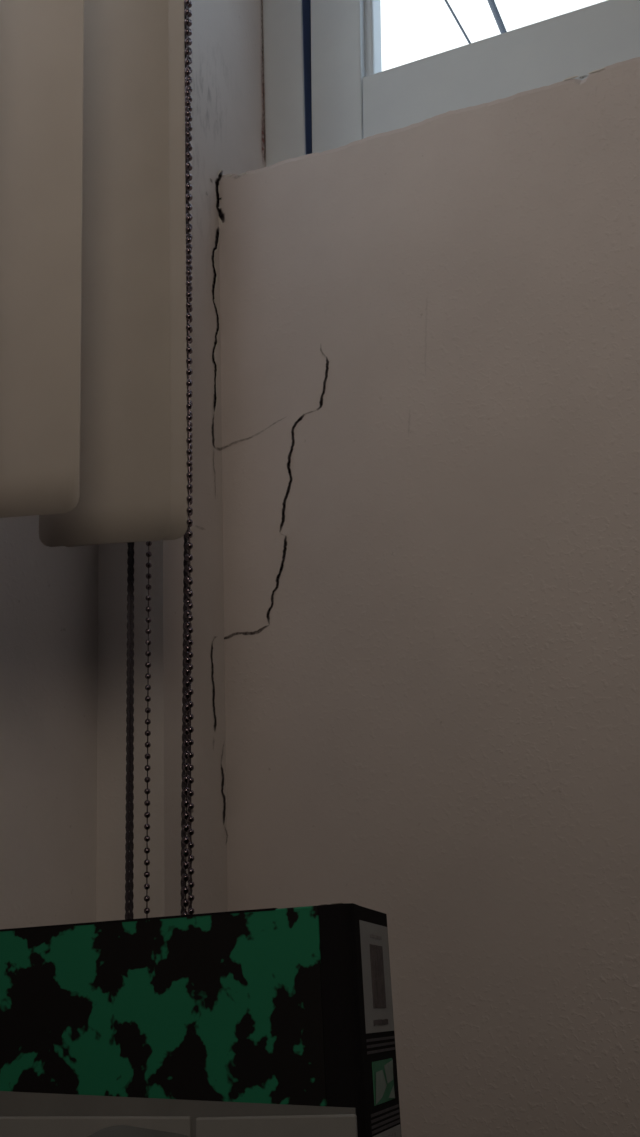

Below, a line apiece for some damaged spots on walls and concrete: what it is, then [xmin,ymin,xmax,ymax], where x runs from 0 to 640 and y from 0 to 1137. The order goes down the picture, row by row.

crack [212,170,224,447]
crack [211,359,329,729]
crack [219,766,227,822]